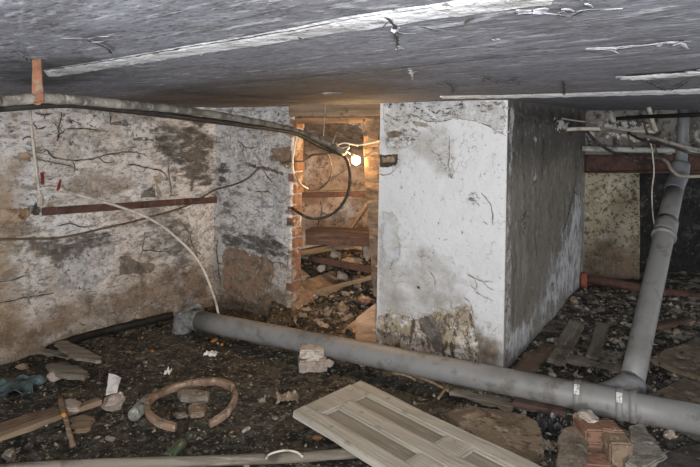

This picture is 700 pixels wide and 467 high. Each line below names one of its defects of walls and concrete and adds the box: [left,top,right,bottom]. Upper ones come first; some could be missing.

peeling [515,0,575,15]
spalling [184,204,274,305]
peeling [373,100,532,362]